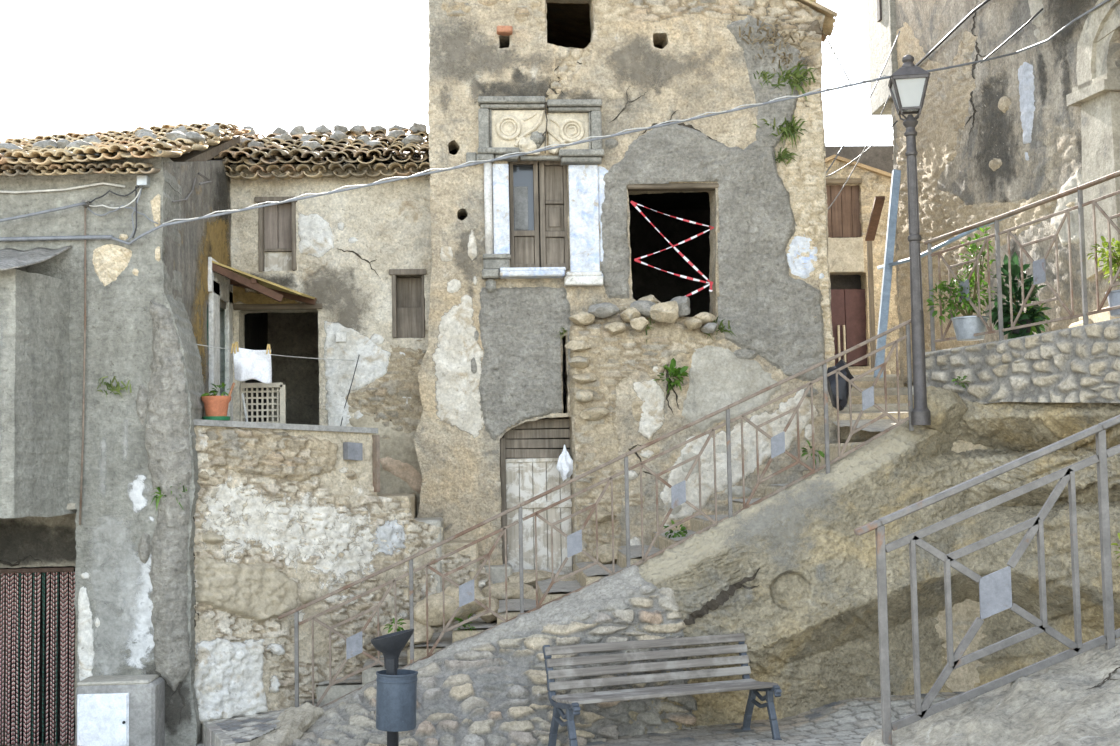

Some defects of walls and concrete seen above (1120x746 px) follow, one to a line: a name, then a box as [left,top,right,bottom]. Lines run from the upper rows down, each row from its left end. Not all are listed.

flaking render [514,0,546,37]
crack [965,0,990,147]
flaking render [545,0,835,369]
flaking render [92,234,139,286]
crack [337,248,380,278]
peeling [440,246,453,262]
peeling [467,230,478,261]
peeling [198,276,484,604]
flaking render [569,295,818,563]
peeling [129,475,154,522]